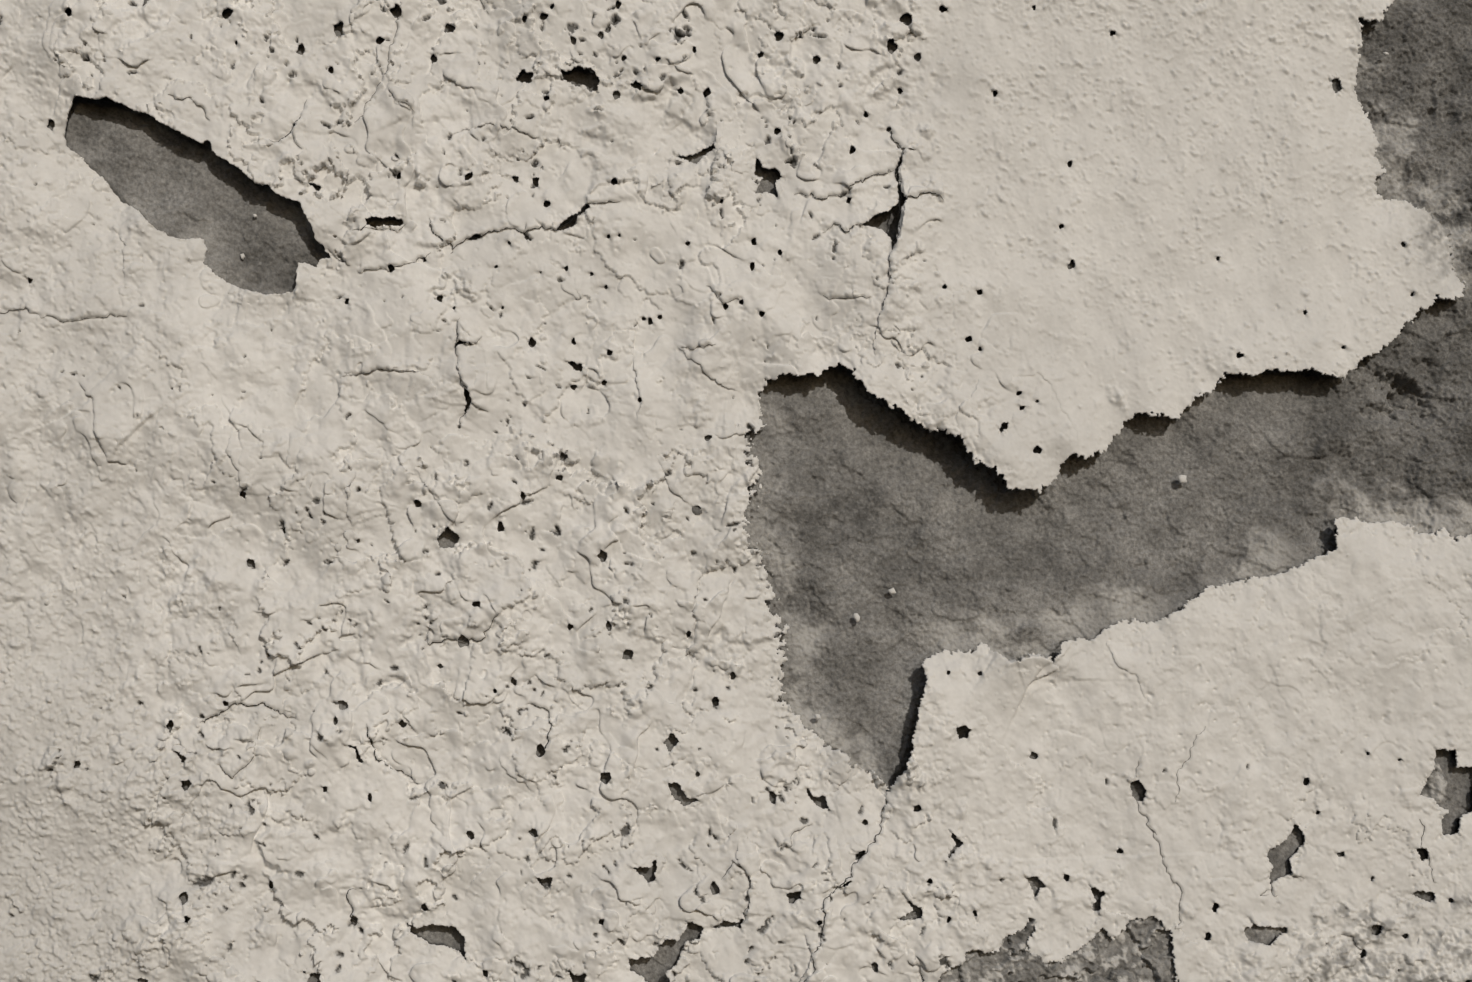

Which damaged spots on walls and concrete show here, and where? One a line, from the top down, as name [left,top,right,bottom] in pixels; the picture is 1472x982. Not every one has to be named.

spalling [45,11,345,314]
crack [330,201,620,272]
crack [802,128,943,306]
spalling [642,0,1472,812]
peeling [1420,749,1472,835]
peeling [945,833,963,862]
peeling [1267,824,1304,902]
spalling [924,876,1197,982]
spalling [1244,891,1472,982]